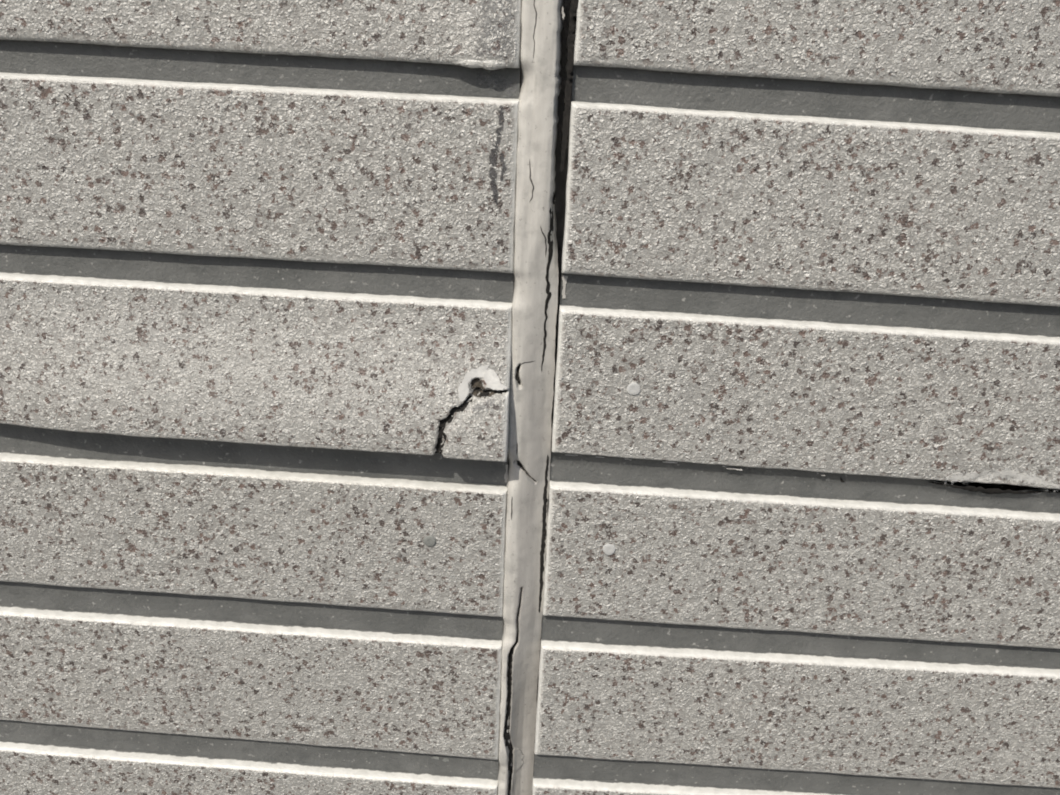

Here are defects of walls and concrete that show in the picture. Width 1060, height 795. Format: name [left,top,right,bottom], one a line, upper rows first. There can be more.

crack [527,159,535,203]
crack [435,361,534,455]
crack [516,443,536,482]
crack [503,587,522,795]